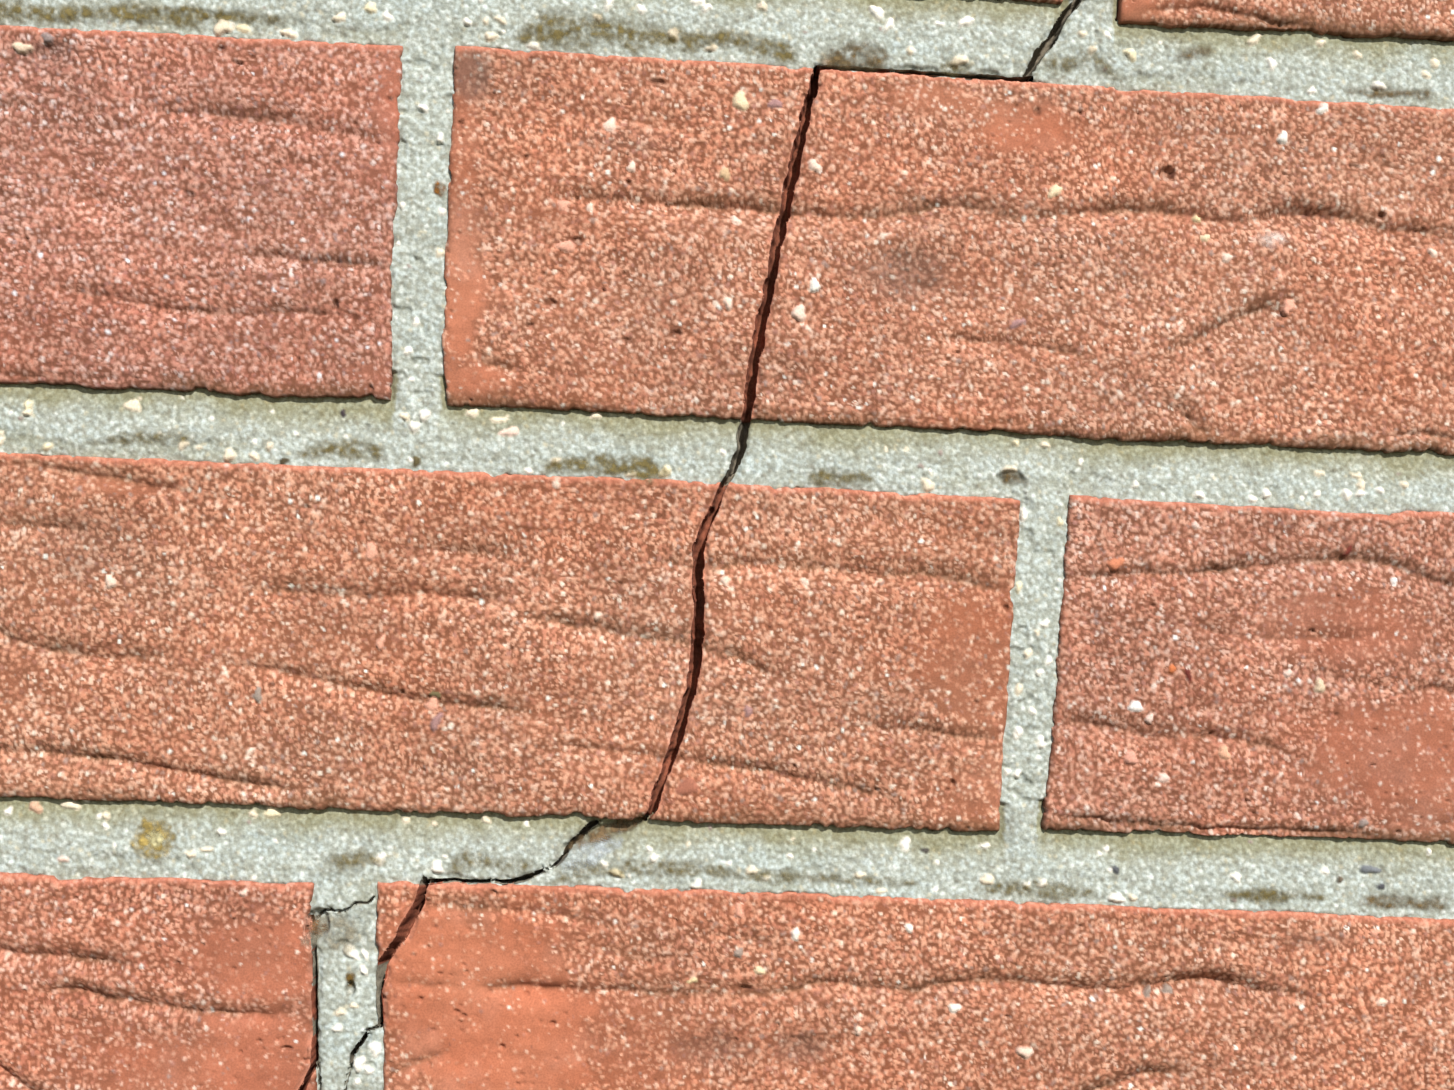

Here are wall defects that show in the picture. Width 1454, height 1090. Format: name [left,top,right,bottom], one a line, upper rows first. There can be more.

crack [644,0,1082,820]
crack [298,820,599,1090]